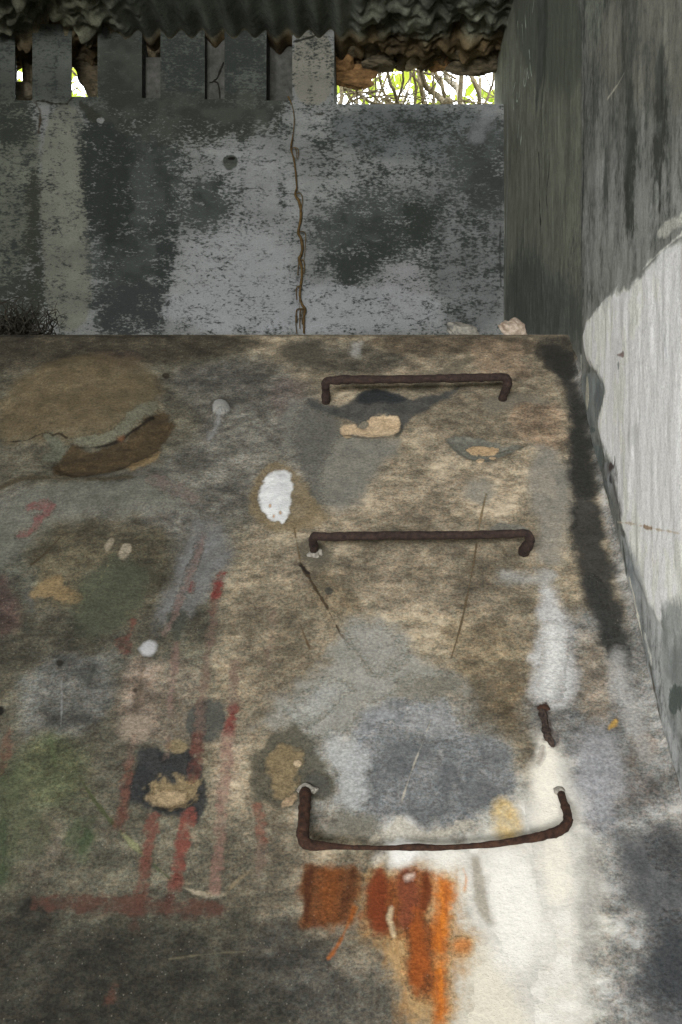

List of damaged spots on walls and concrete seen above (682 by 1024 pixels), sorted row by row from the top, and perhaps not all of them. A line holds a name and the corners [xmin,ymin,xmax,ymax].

water stain [0,166,55,335]
water stain [66,24,296,335]
water stain [300,110,504,285]
peeling [0,409,178,493]
spalling [338,413,402,439]
water stain [273,352,480,520]
spalling [444,434,526,464]
water stain [480,222,662,772]
spalling [113,707,211,827]
spalling [244,722,342,818]
rust [486,792,527,849]
rust [292,853,491,1024]